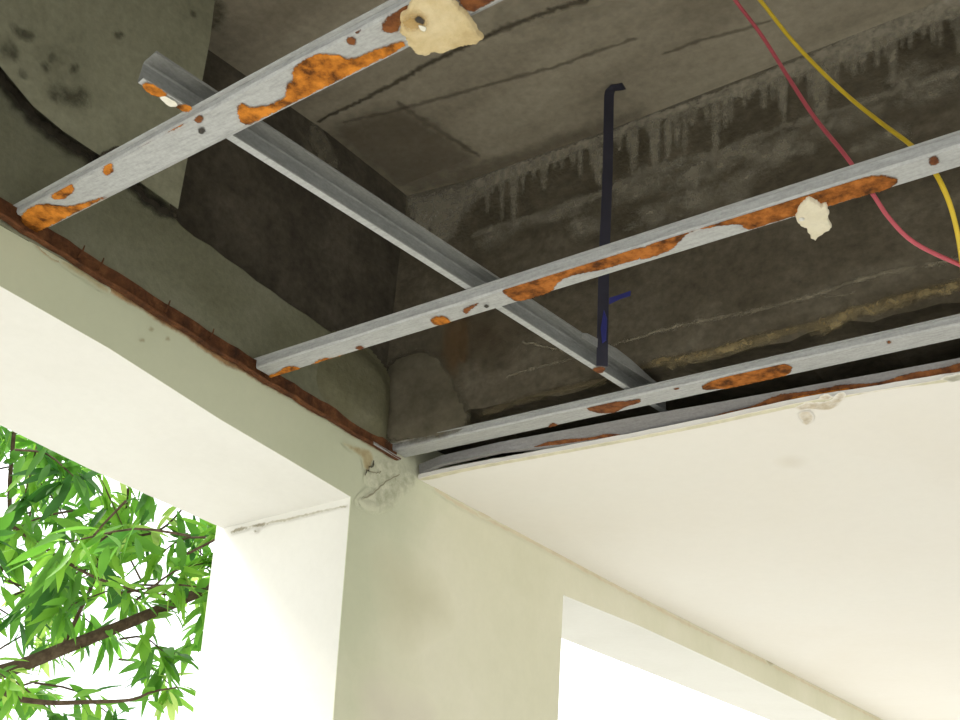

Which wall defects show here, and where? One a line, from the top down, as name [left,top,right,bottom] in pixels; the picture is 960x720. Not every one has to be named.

corrosion [459,0,495,12]
corrosion [142,83,167,97]
corrosion [237,5,408,125]
crack [318,0,589,123]
corrosion [169,104,203,132]
leakage [408,0,960,242]
corrosion [502,175,898,301]
corrosion [21,184,390,472]
corrosion [431,316,450,325]
corrosion [587,399,641,414]
corrosion [702,363,960,418]
corrosion [534,434,620,447]